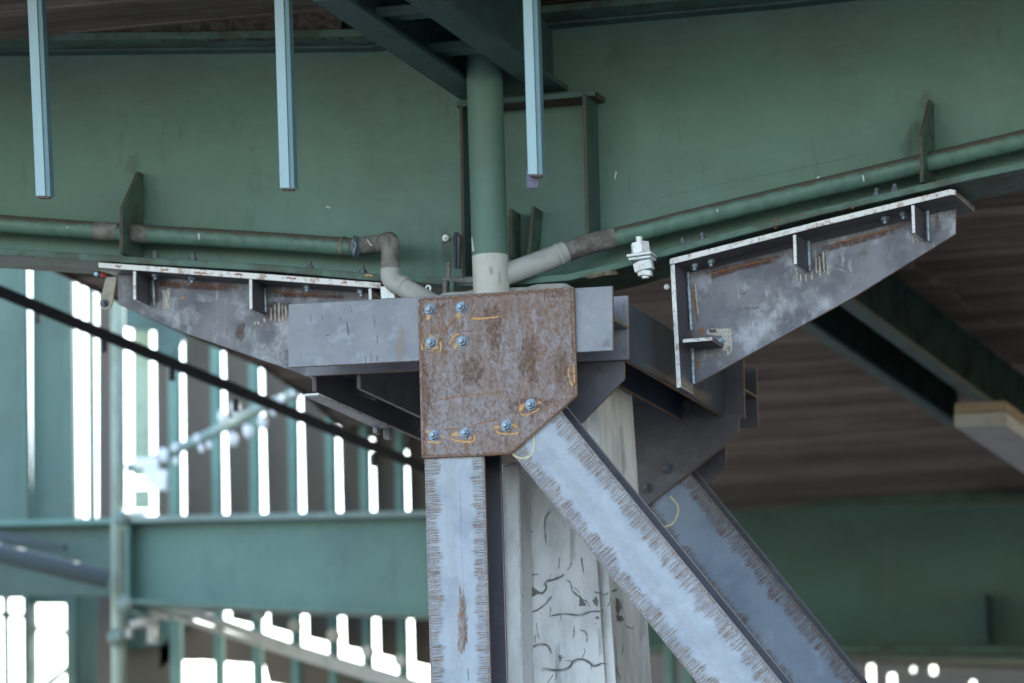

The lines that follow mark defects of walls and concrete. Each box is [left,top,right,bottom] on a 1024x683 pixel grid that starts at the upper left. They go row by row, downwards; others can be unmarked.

rust [823,226,900,250]
rust [707,257,776,278]
rust [161,269,241,299]
rust [269,290,341,299]
rust [419,288,793,683]
rust [678,474,859,683]
crack [531,511,653,682]